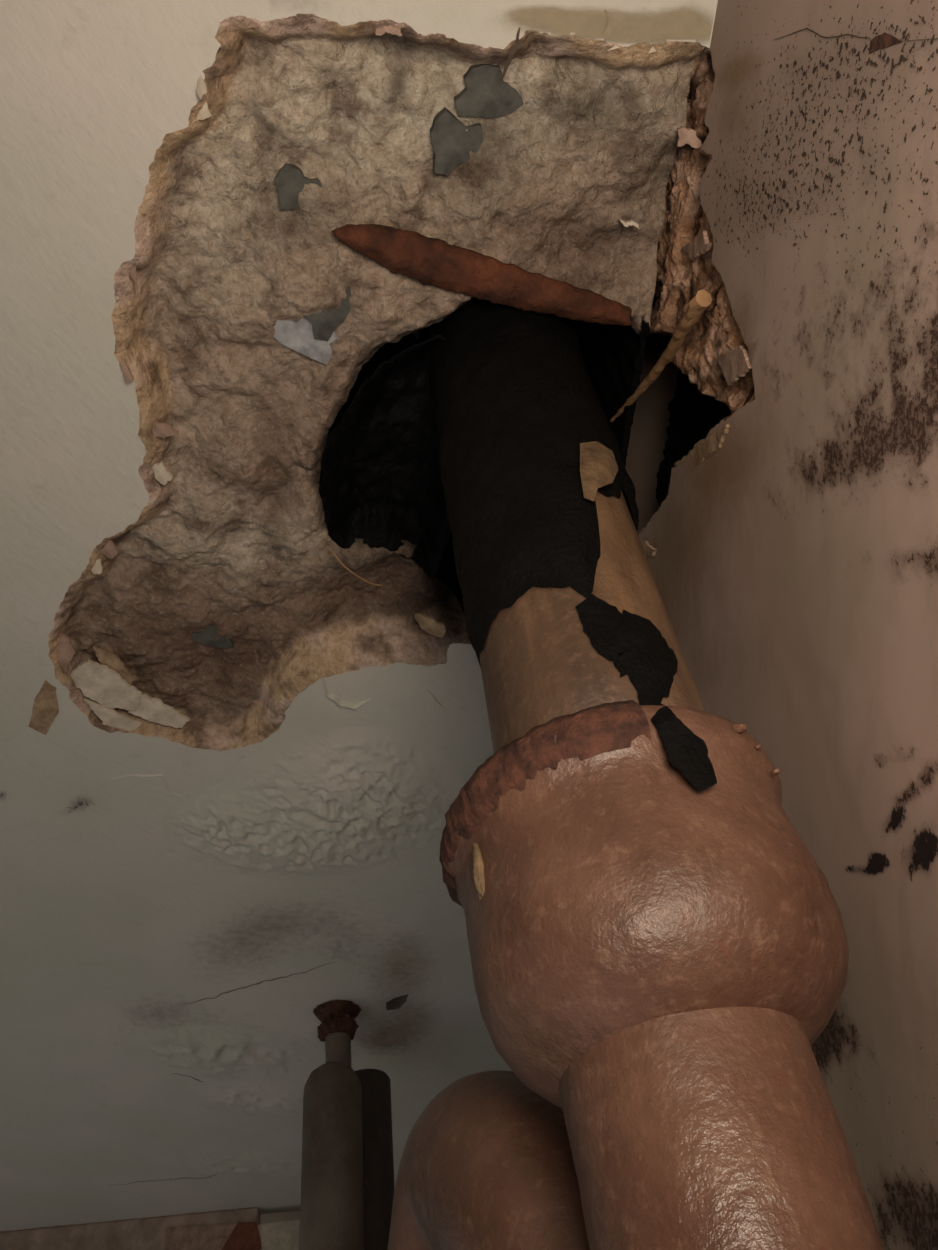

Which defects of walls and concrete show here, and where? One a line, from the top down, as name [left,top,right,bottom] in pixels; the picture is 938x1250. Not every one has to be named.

rust [331,224,632,326]
leakage [700,0,938,504]
spalling [29,13,755,751]
leakage [891,542,938,577]
leakage [846,852,891,875]
leakage [886,761,938,882]
leakage [811,1004,872,1102]
leakage [864,1168,938,1250]